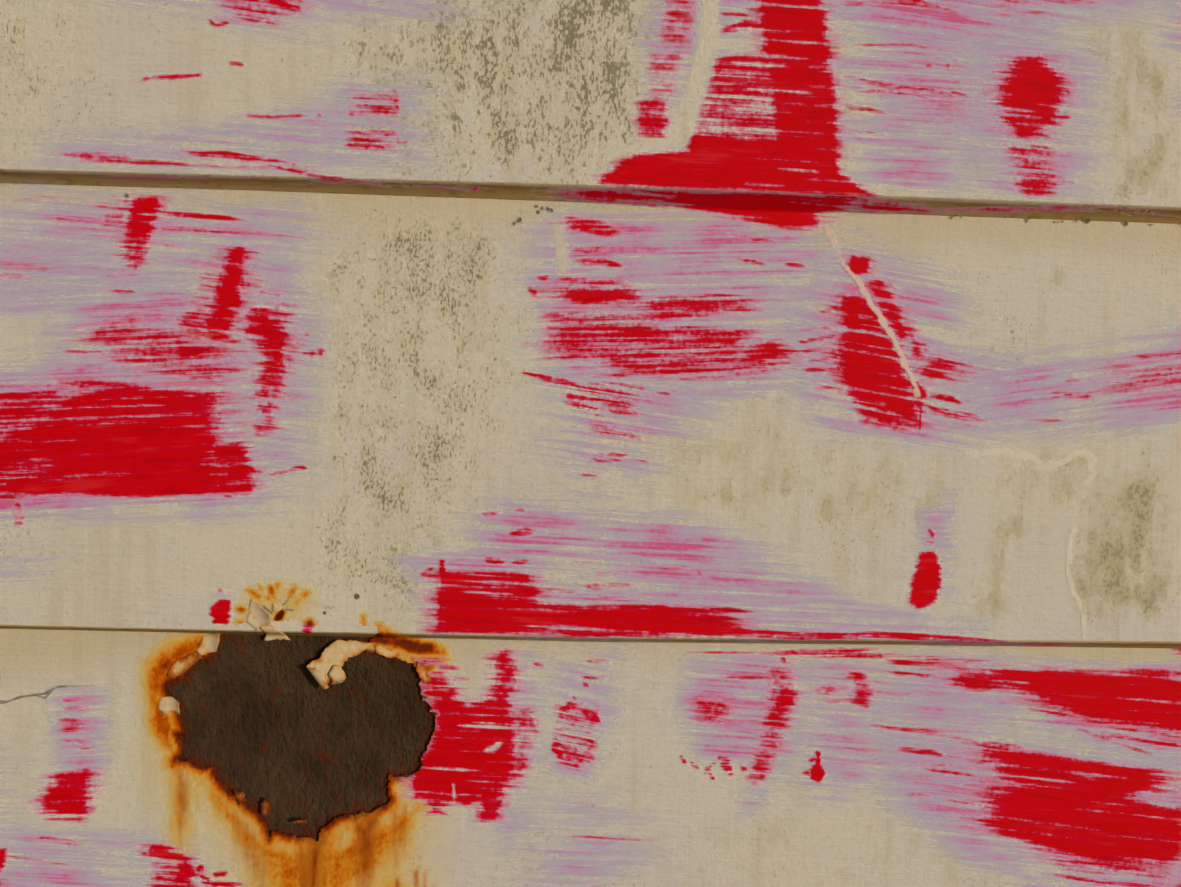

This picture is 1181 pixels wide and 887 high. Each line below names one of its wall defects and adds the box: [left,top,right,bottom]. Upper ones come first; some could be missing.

water stain [337,0,672,186]
water stain [314,208,533,616]
water stain [1074,452,1174,622]
rust [234,582,318,641]
crack [0,685,75,704]
peeling [158,696,180,716]
peeling [166,634,220,679]
peeling [306,640,400,690]
rust [142,614,451,887]